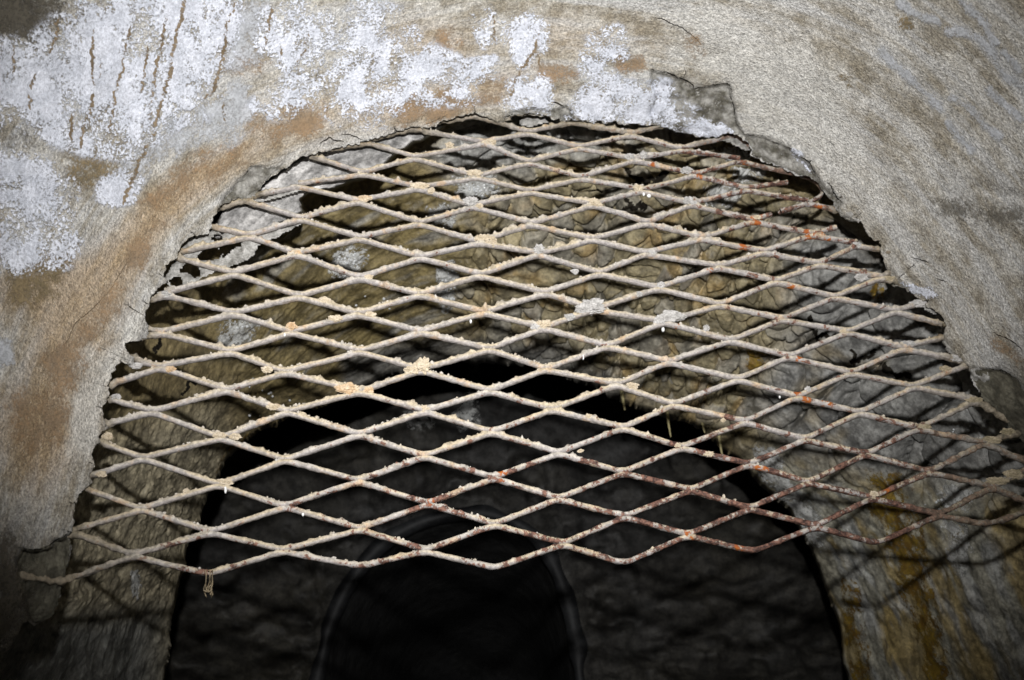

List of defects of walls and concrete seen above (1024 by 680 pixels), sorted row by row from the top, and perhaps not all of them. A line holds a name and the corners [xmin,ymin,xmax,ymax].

water stain [0,0,766,314]
spalling [503,106,575,127]
spalling [650,69,862,223]
peeling [165,224,301,286]
spalling [970,368,1024,442]
spalling [16,536,71,623]
corrosion [841,578,871,680]
corrosion [866,470,952,680]